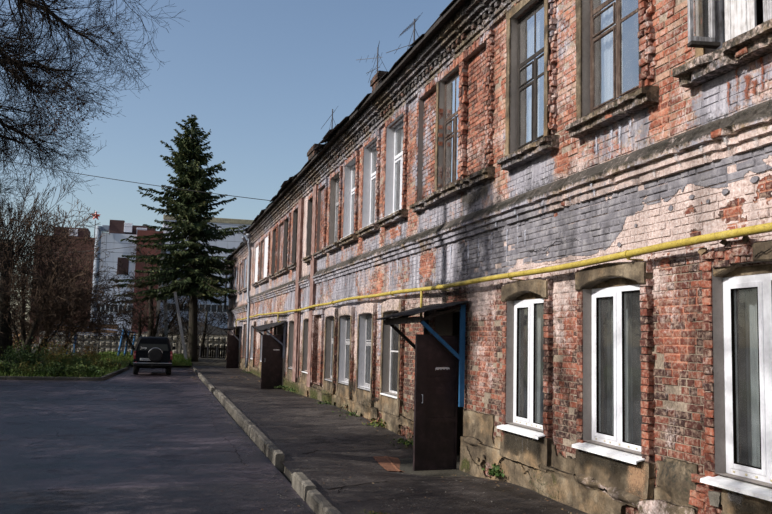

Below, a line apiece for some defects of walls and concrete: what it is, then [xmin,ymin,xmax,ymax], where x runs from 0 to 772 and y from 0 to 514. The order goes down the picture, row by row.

peeling [648,97,671,132]
peeling [456,139,772,281]
crack [467,448,553,485]
flaking render [626,474,723,514]